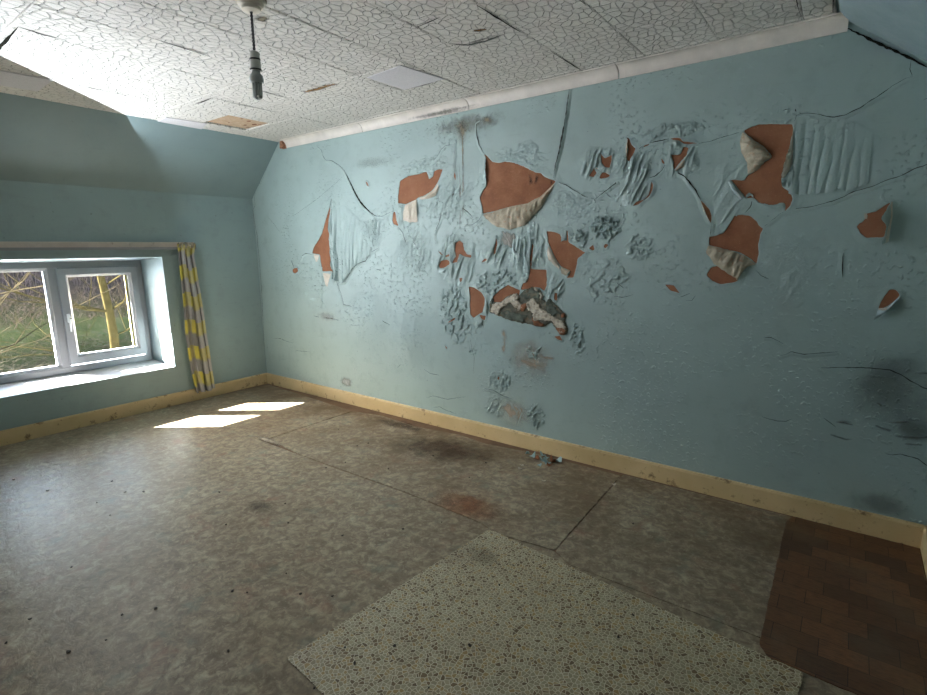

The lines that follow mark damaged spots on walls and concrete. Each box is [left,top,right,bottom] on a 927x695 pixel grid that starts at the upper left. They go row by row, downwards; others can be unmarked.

crack [0,27,63,50]
crack [551,51,621,203]
peeling [588,135,654,181]
peeling [659,134,699,171]
peeling [310,195,372,286]
peeling [391,165,458,228]
peeling [438,148,562,273]
peeling [698,113,804,290]
peeling [850,198,899,245]
spalling [447,225,610,343]
peeling [873,285,906,320]